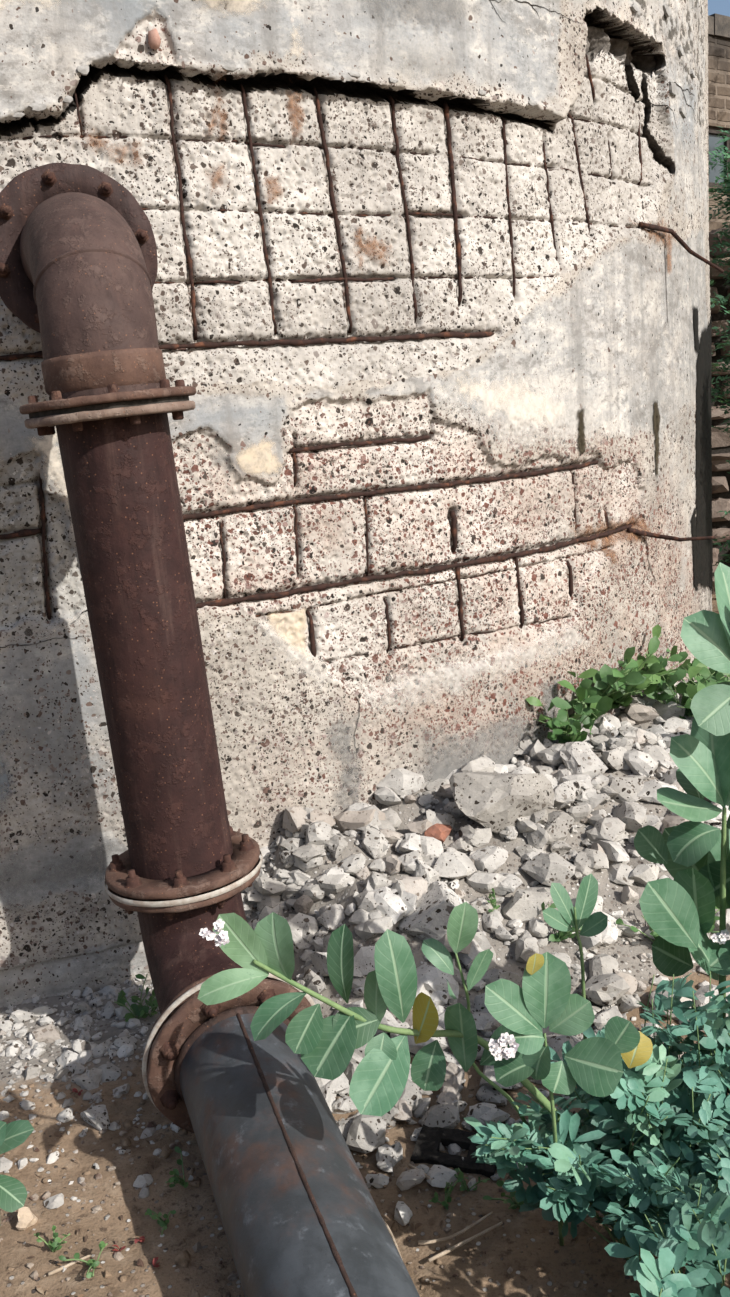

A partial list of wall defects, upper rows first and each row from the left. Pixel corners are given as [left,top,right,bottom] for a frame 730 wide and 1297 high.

corrosion [288,93,304,129]
spalling [0,0,724,705]
corrosion [581,517,650,562]